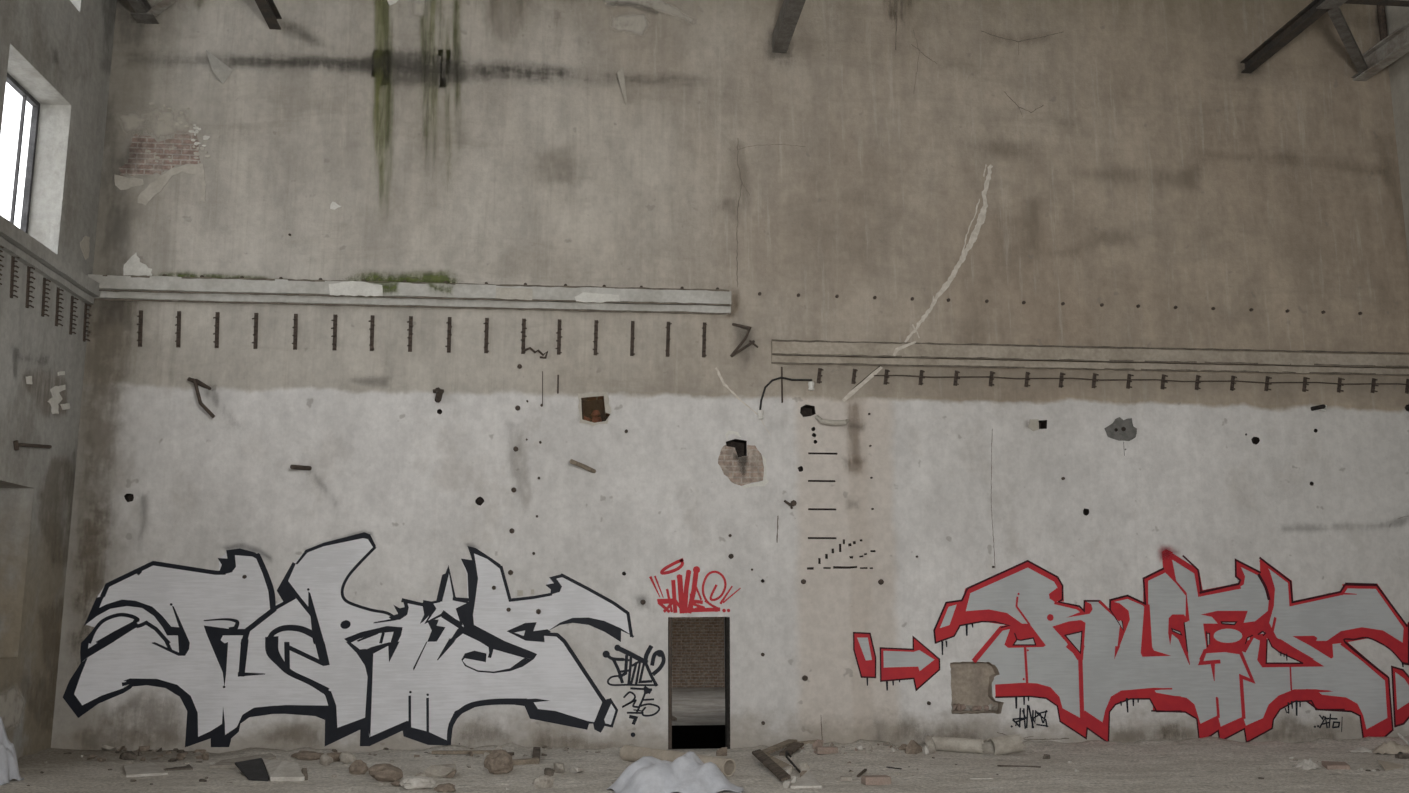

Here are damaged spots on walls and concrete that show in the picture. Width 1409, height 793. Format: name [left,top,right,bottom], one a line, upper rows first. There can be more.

damp [375,0,391,143]
spalling [114,102,211,206]
crack [842,164,993,402]
spalling [578,392,611,426]
spalling [718,431,769,489]
spalling [950,661,1004,714]